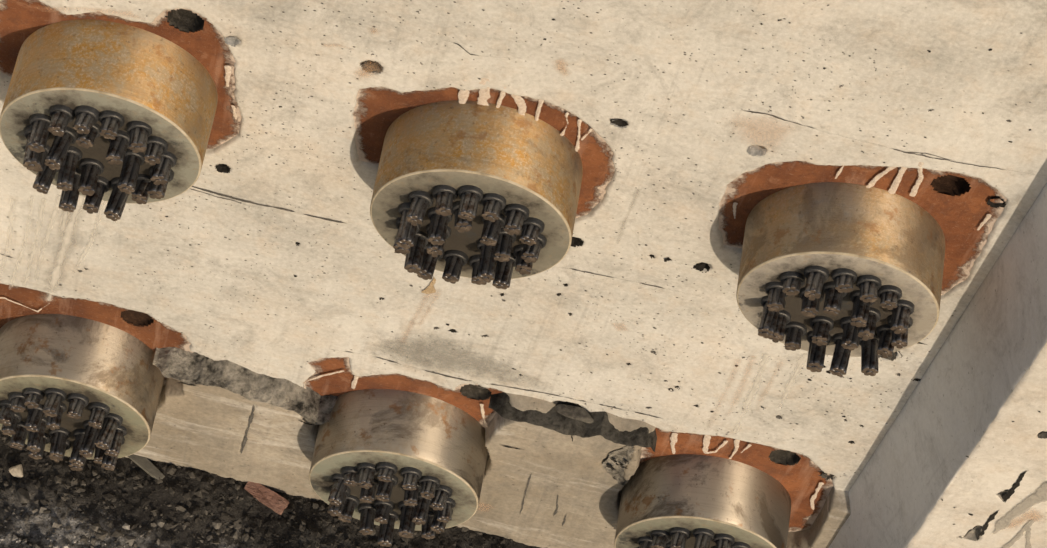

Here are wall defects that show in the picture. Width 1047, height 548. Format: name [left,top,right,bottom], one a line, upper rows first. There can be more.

crack [977,471,1027,540]